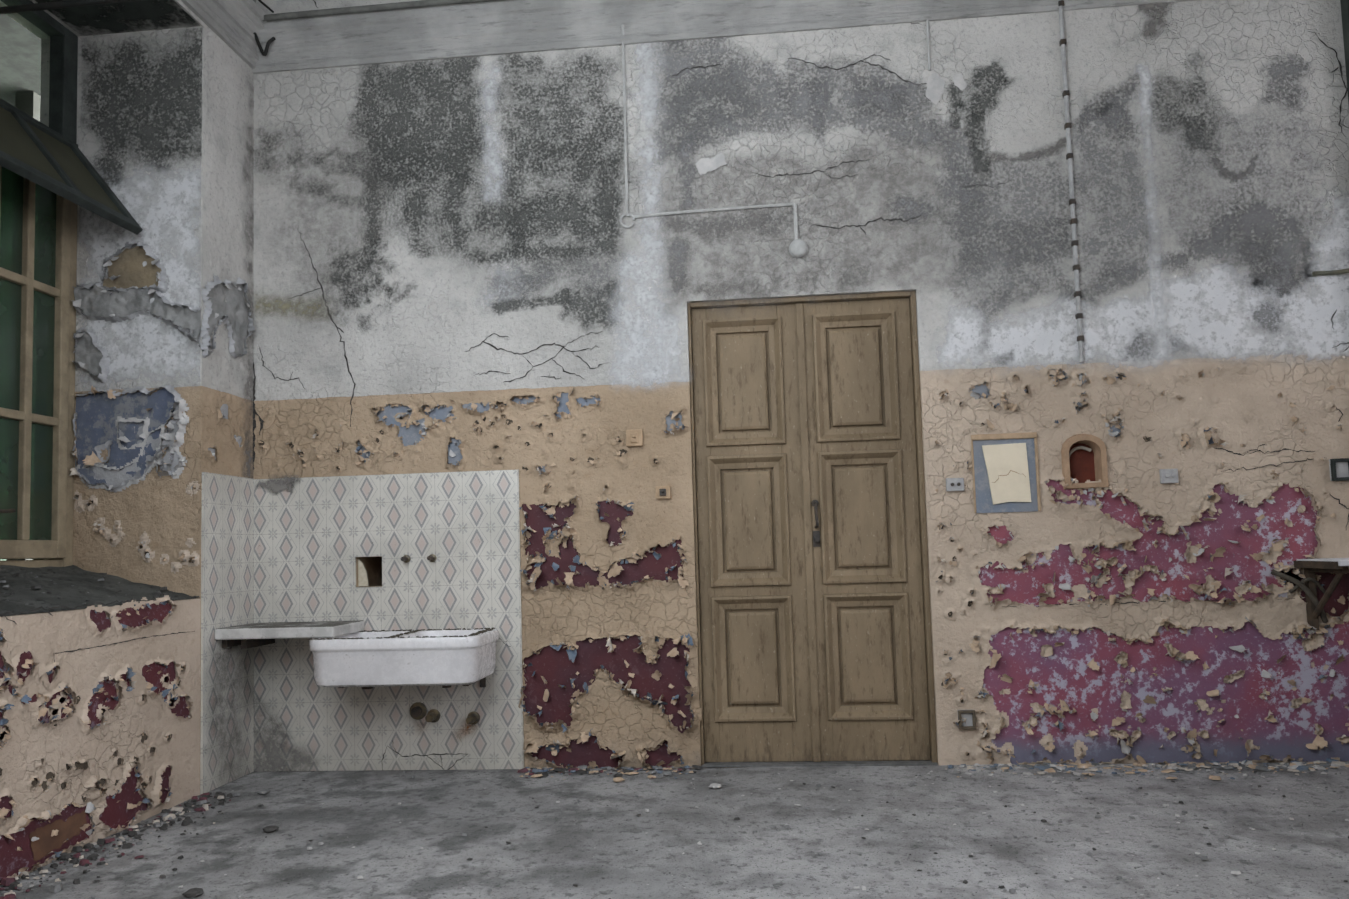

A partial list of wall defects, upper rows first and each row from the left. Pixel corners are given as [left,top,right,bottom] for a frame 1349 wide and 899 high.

water stain [1139,2,1170,36]
water stain [79,29,202,387]
water stain [331,37,1349,385]
peeling [69,241,255,492]
crack [288,232,356,427]
crack [469,331,609,382]
peeling [519,460,692,597]
peeling [0,622,194,751]
peeling [84,595,177,638]
peeling [518,628,702,771]
peeling [970,471,1349,765]
peeling [0,757,175,885]